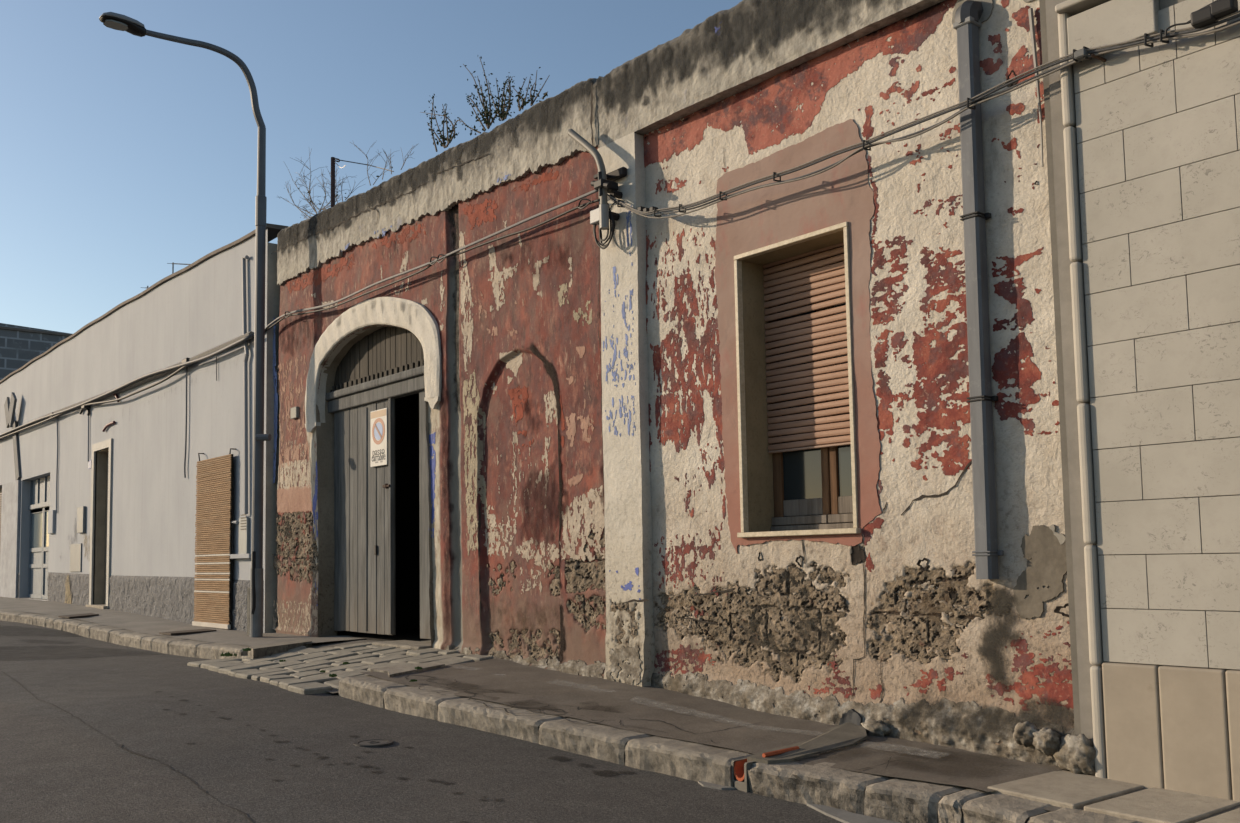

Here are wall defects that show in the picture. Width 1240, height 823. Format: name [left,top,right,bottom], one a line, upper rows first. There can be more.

leakage [278,0,880,254]
leakage [842,2,941,47]
peeling [980,0,1045,123]
peeling [643,0,972,481]
peeling [991,247,1060,436]
flaking render [272,317,318,636]
flaking render [459,198,884,700]
crack [882,460,972,516]
flaking render [866,562,998,696]
leakage [977,586,1019,688]
peeling [986,621,1074,710]
crack [3,672,255,823]